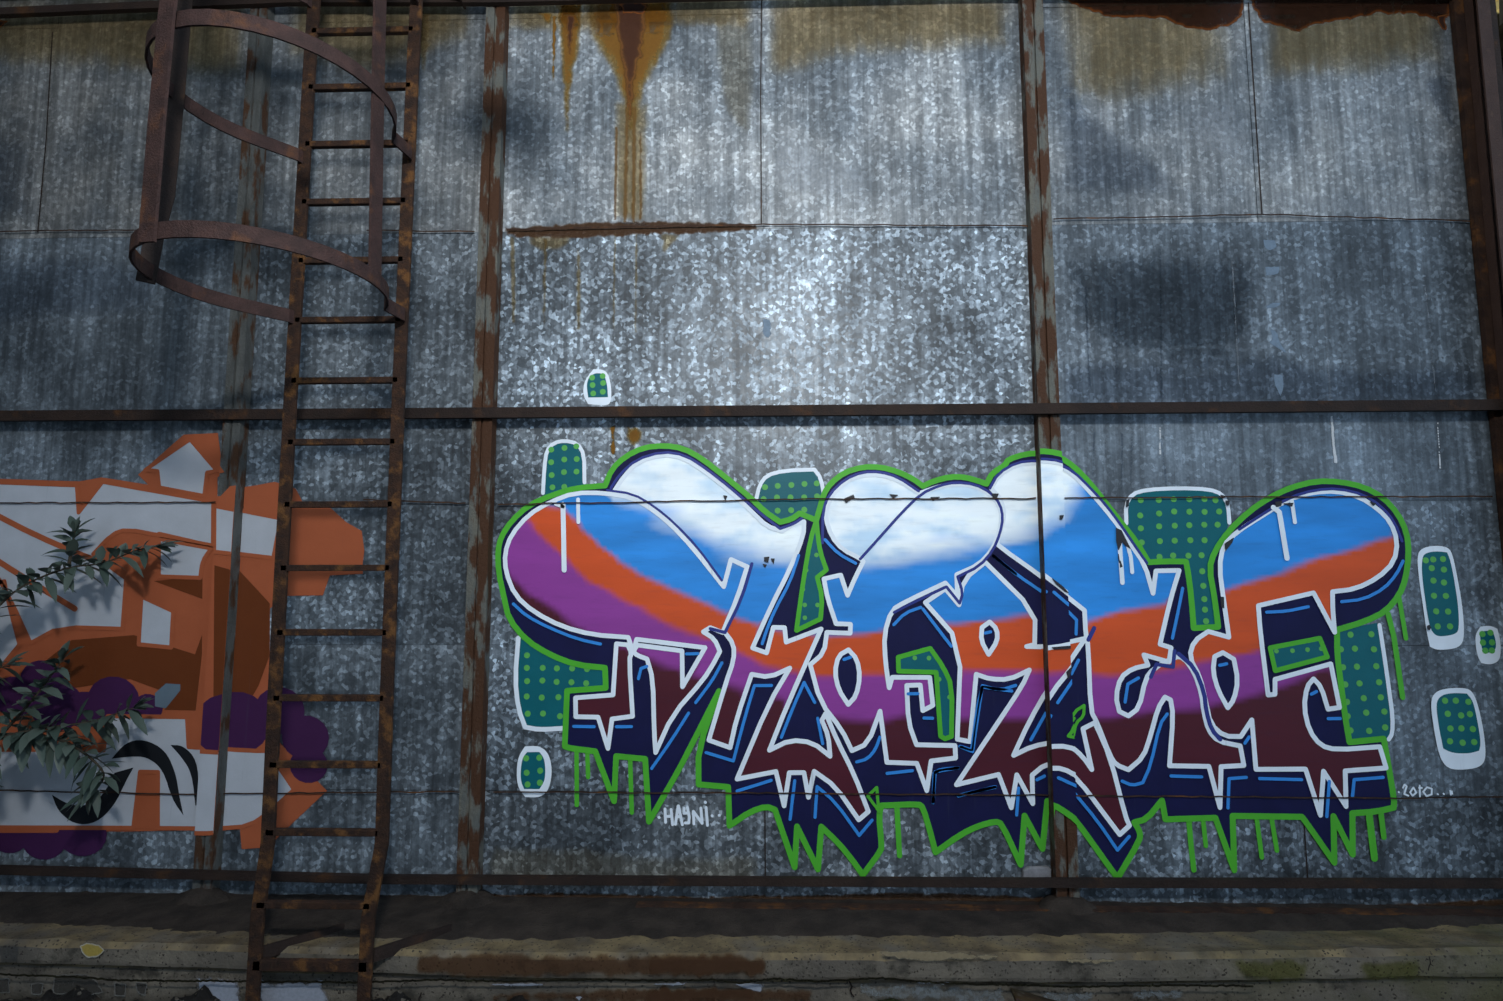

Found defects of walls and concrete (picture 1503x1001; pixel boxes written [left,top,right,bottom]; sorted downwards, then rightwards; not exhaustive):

rust [1064,0,1449,32]
rust [506,3,756,239]
rust [492,892,1042,902]